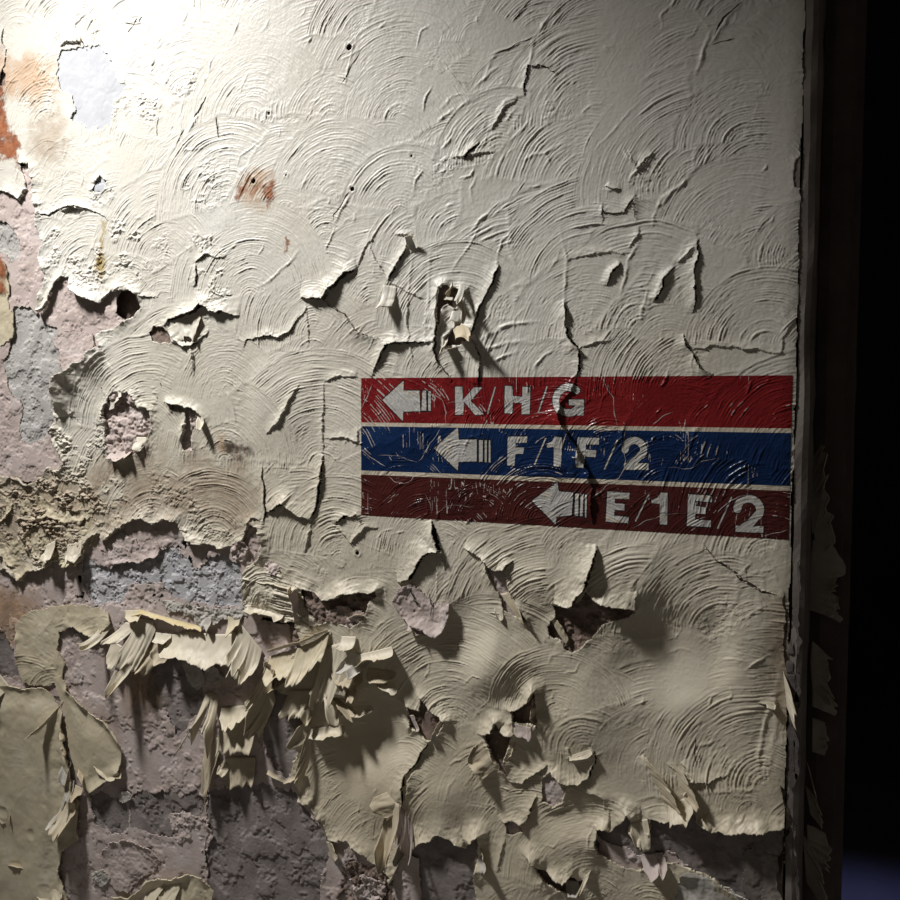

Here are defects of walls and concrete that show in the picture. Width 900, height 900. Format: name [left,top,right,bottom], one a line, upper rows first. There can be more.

corrosion [0,87,21,161]
spalling [56,11,126,131]
crack [176,97,219,145]
corrosion [234,172,274,205]
crack [362,395,483,484]
crack [599,379,626,491]
peeling [0,144,837,900]
peeling [797,445,846,622]
crack [700,546,788,665]